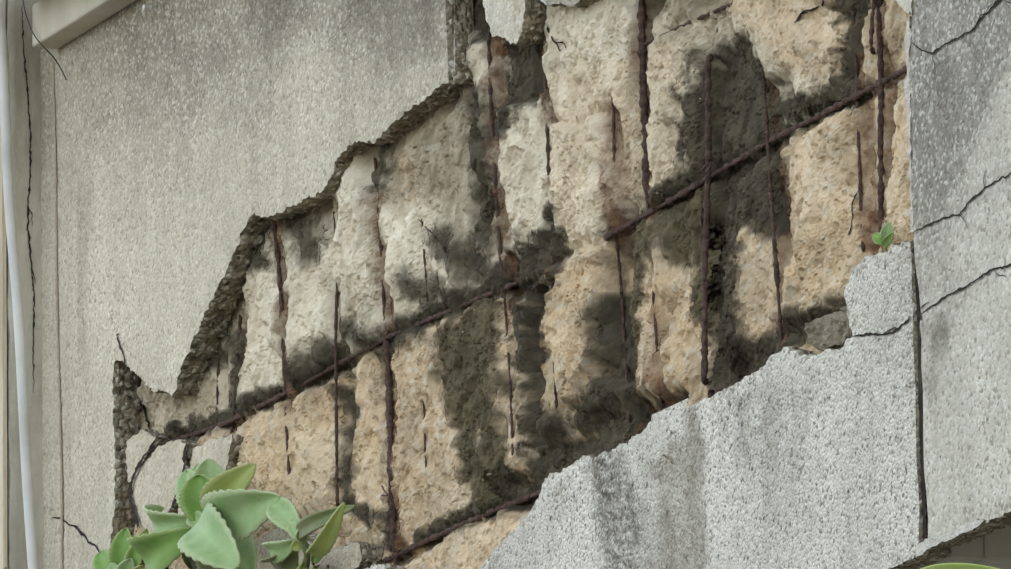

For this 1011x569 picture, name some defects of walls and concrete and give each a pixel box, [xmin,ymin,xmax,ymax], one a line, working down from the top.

crack [913,0,1011,74]
rust [882,39,899,113]
rust [862,208,887,255]
crack [913,172,1011,233]
spalling [125,0,914,569]
crack [852,263,1011,337]
crack [51,517,99,552]
spalling [916,519,990,558]